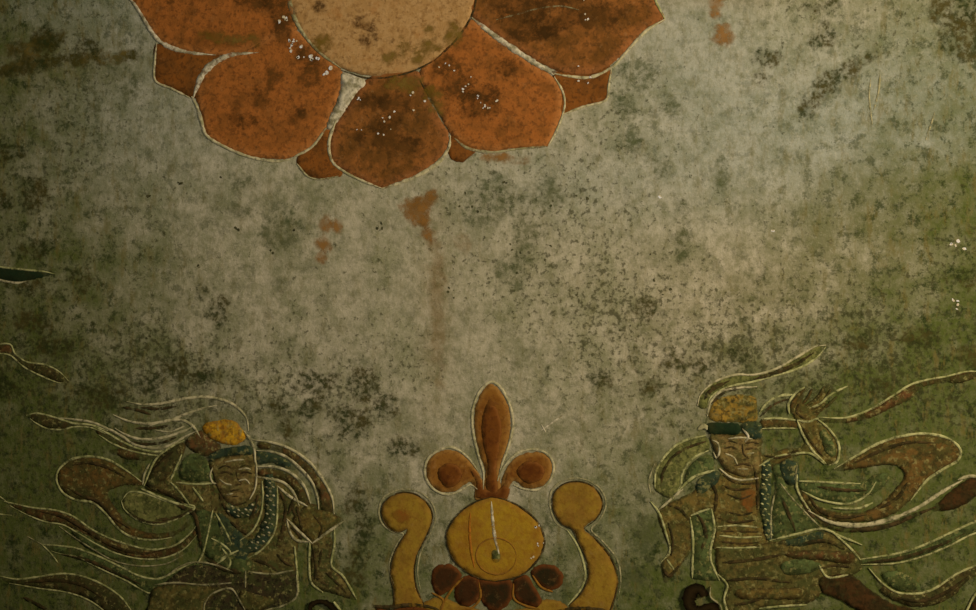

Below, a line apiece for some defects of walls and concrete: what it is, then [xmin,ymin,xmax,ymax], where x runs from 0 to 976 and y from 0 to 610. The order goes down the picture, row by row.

damp [806,0,837,47]
damp [931,0,976,63]
damp [755,49,779,79]
damp [798,53,872,117]
damp [270,370,335,437]
damp [332,367,397,438]
damp [389,438,420,456]